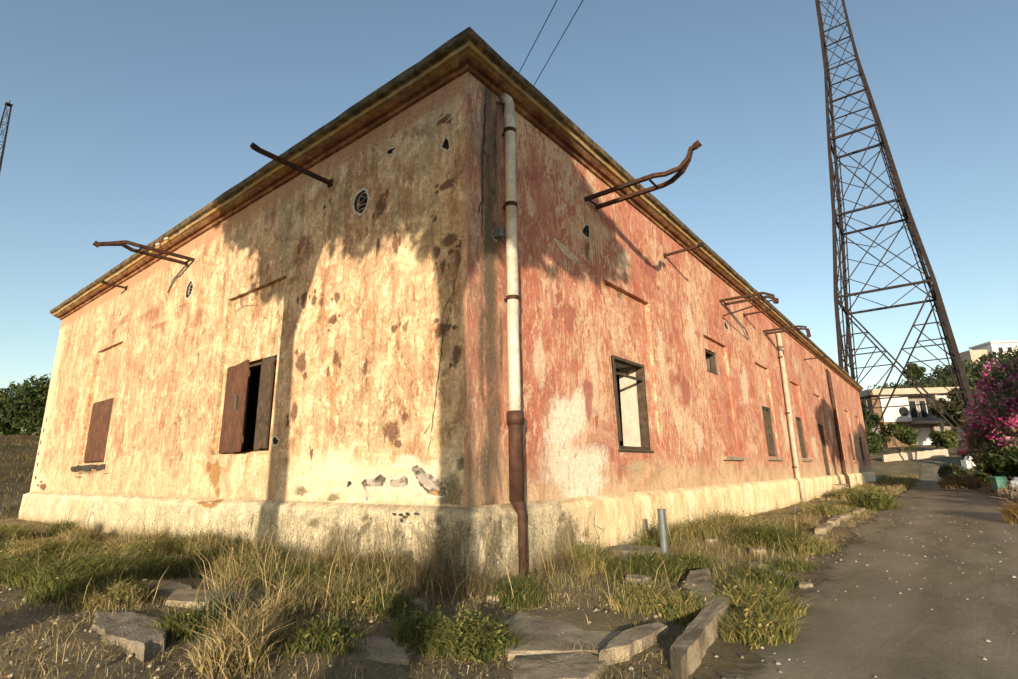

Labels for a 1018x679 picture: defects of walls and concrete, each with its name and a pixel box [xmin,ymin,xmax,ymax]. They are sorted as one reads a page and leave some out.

flaking render [440,136,451,152]
damp [479,139,502,390]
damp [297,289,340,332]
damp [434,318,457,339]
damp [295,350,307,379]
crack [424,253,461,461]
damp [449,345,462,369]
peeling [532,325,547,390]
damp [286,402,298,426]
peeling [536,347,614,498]
flaking render [345,462,449,541]